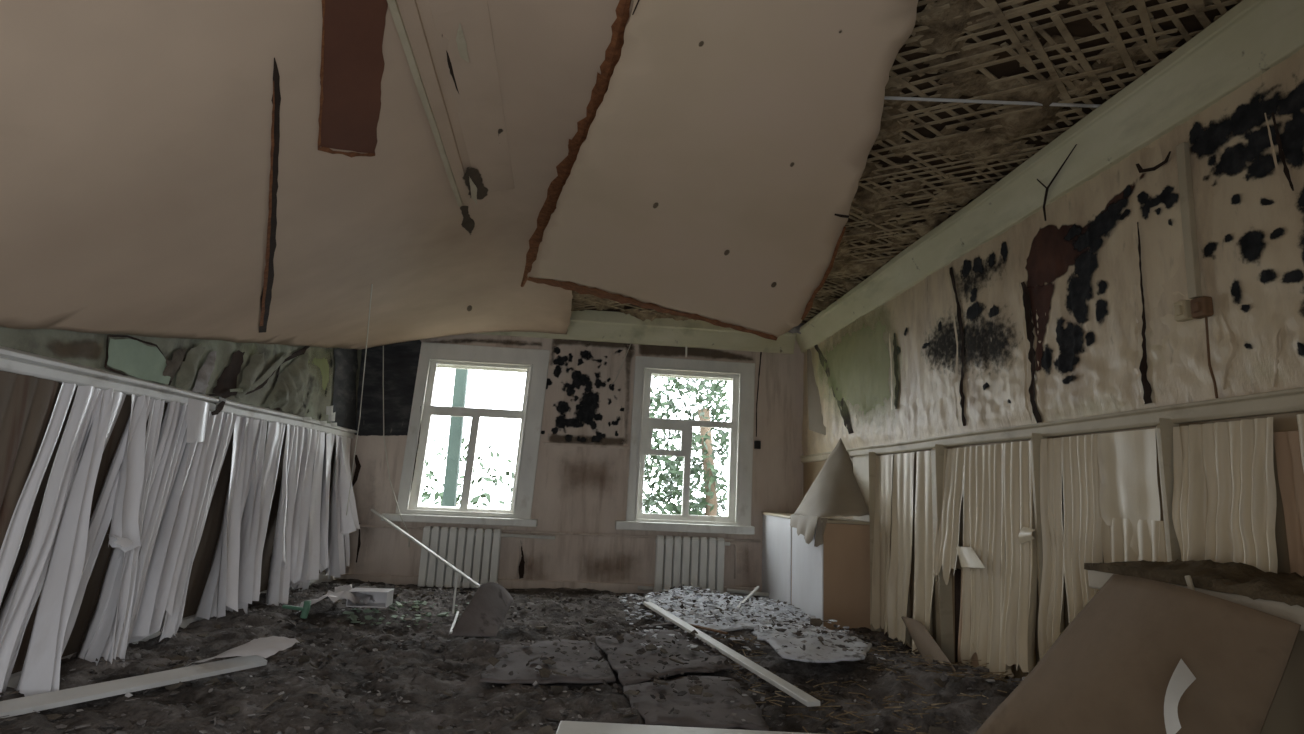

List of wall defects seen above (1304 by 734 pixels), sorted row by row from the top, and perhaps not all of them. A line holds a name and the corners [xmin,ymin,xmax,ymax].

peeling [318,0,388,158]
leakage [1189,81,1304,204]
flaking render [49,335,264,399]
crack [209,58,310,410]
flaking render [262,352,337,426]
leakage [303,340,422,436]
leakage [440,339,752,445]
leakage [922,242,1017,390]
leakage [1025,151,1178,384]
leakage [1204,187,1304,316]
peeling [901,616,956,672]